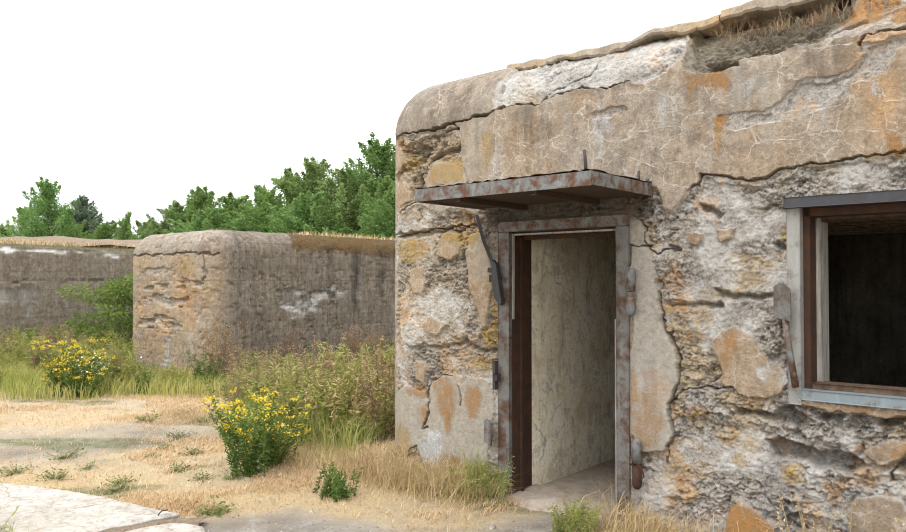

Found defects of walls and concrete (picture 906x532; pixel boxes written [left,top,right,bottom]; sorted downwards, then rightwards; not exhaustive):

crack [509,64,733,168]
spalling [493,0,906,130]
crack [690,79,906,188]
spalling [395,126,906,532]
crack [644,290,745,464]